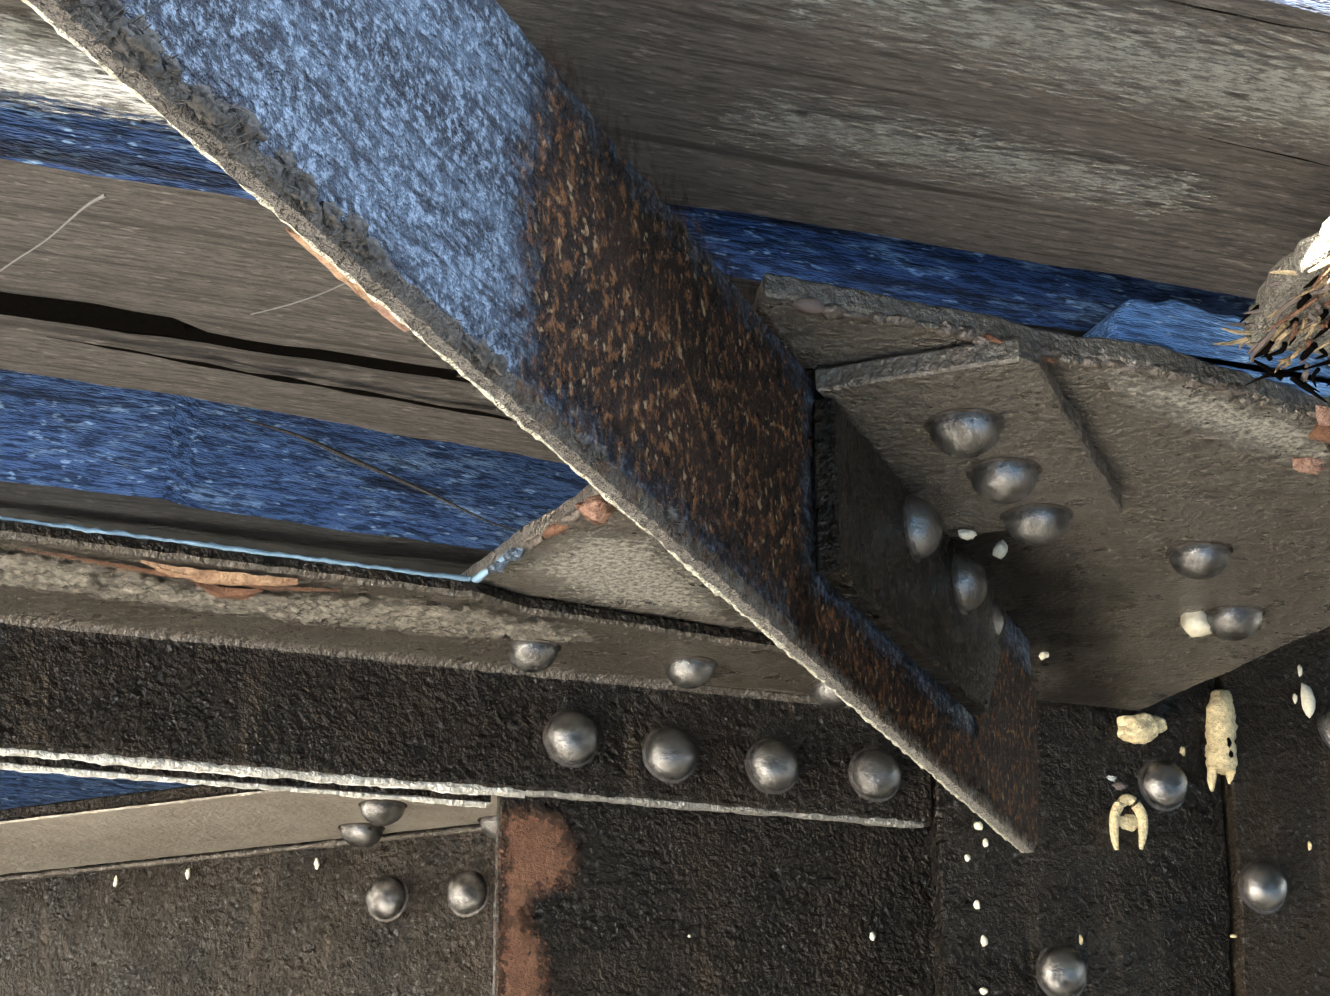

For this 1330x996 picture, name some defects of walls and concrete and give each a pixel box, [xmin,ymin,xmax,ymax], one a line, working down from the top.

crack [0,291,513,421]
peeling [285,227,477,390]
peeling [24,549,340,600]
rust [496,808,576,996]